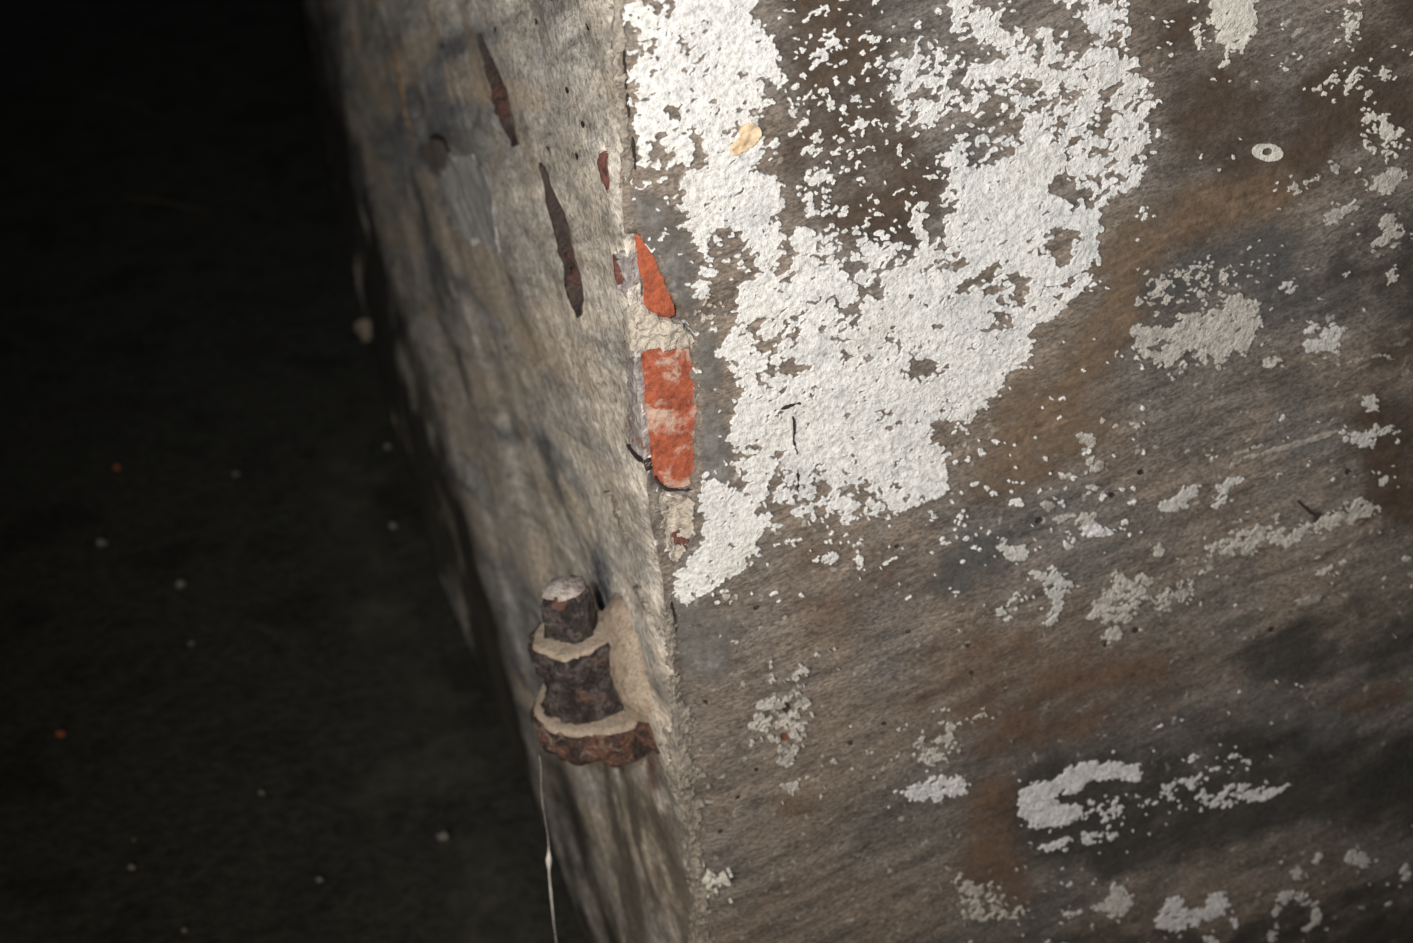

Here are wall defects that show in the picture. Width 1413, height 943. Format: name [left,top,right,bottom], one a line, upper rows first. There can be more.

spalling [477,27,519,147]
peeling [1273,0,1413,286]
spalling [539,147,584,318]
peeling [597,0,1382,677]
peeling [1338,394,1401,449]
peeling [887,770,971,808]
peeling [1016,743,1291,888]
spalling [702,861,733,904]
peeling [951,871,1030,943]
peeling [1059,878,1135,930]
peeling [1148,891,1239,943]
peeling [1267,852,1336,943]